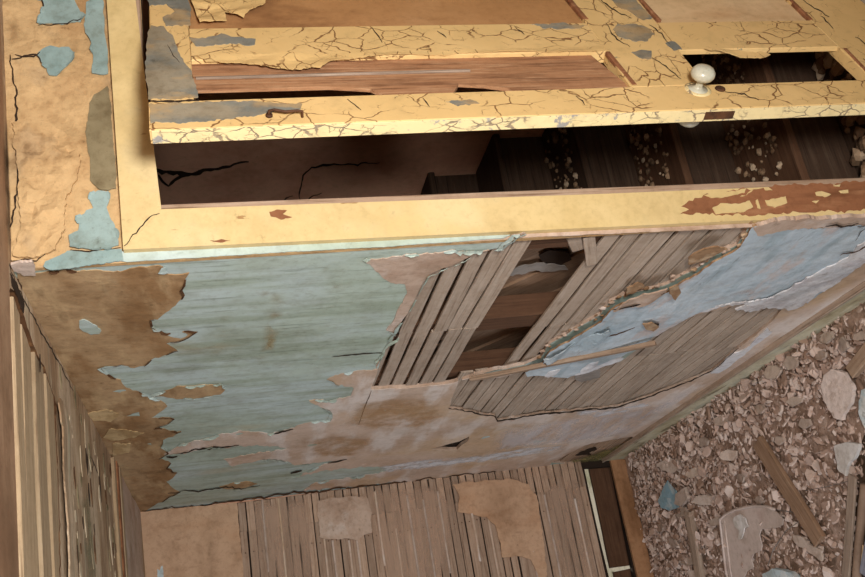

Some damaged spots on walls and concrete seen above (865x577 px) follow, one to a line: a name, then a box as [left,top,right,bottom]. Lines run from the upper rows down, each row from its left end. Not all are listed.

crack [40,0,81,26]
crack [9,52,41,121]
crack [157,161,249,187]
peeling [17,181,865,577]